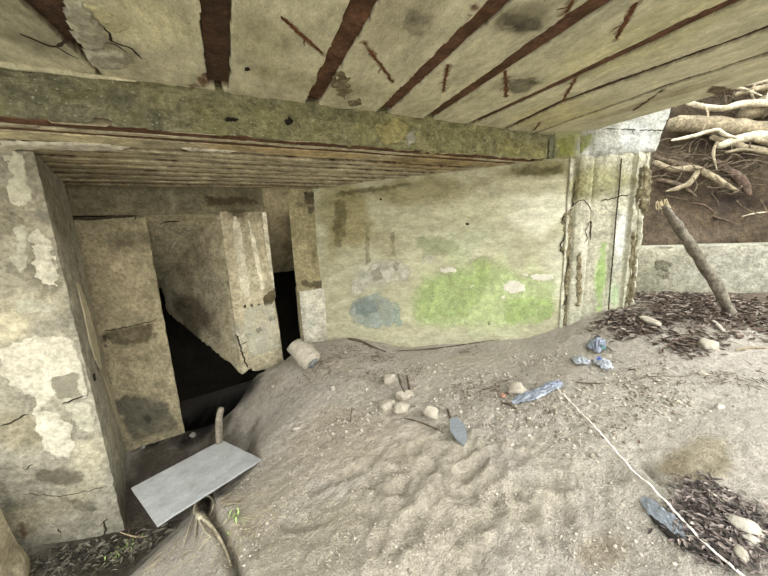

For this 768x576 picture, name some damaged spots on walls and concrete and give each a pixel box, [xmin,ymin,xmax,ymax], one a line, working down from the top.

peeling [62,0,142,70]
flaking render [0,140,132,207]
flaking render [9,224,60,286]
crack [571,158,630,310]
damp [350,261,410,329]
damp [76,282,177,439]
crack [235,334,248,367]
flaking render [0,335,96,459]
crack [25,486,107,497]